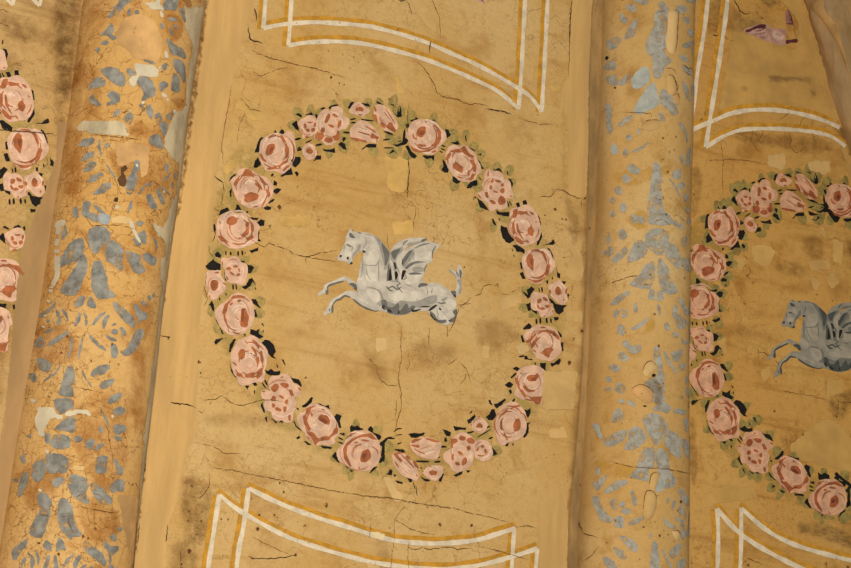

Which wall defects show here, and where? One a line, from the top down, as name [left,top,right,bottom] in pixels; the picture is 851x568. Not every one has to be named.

flaking render [77,120,129,136]
crack [209,91,258,255]
peeling [46,220,66,303]
peeling [111,197,141,243]
flaking render [129,0,206,568]
crack [241,234,337,261]
crack [428,284,513,346]
flaking render [30,399,91,436]
crack [170,396,278,412]
crack [369,328,410,435]
crack [193,444,536,568]